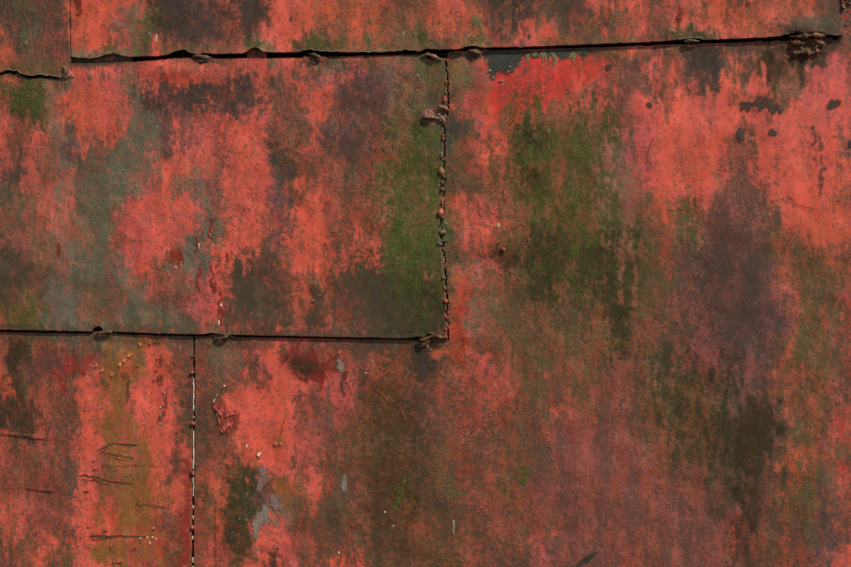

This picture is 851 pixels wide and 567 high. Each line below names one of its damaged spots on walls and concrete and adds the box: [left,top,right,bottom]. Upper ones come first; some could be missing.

peeling [740,94,784,114]
corrosion [196,265,225,326]
peeling [94,337,160,460]
peeling [153,354,168,425]
peeling [213,394,239,434]
corrosion [281,343,337,388]
peeling [252,452,297,545]